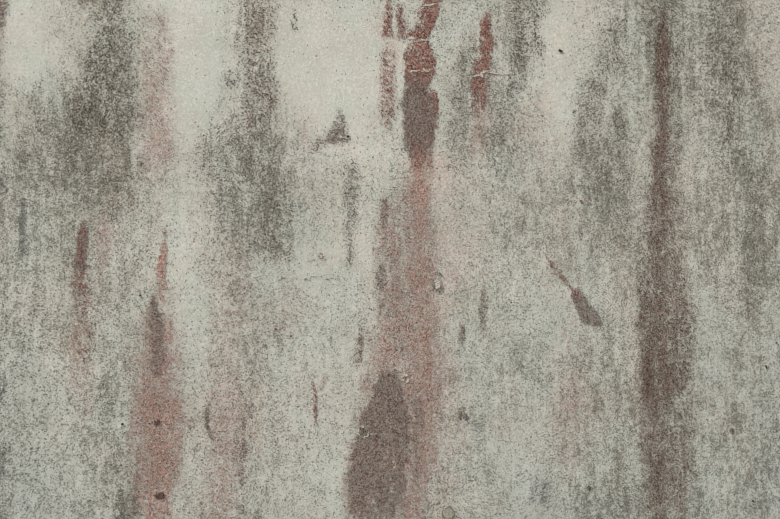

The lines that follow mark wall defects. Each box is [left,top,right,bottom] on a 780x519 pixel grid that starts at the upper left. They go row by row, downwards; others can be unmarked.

damp [17,198,27,259]
damp [13,0,145,219]
corrosion [69,221,108,367]
corrosion [124,228,195,519]
damp [194,0,299,263]
damp [310,109,350,153]
corrosion [341,0,443,519]
corrosion [469,6,497,155]
corrosion [546,256,604,326]
corrosion [632,9,702,519]